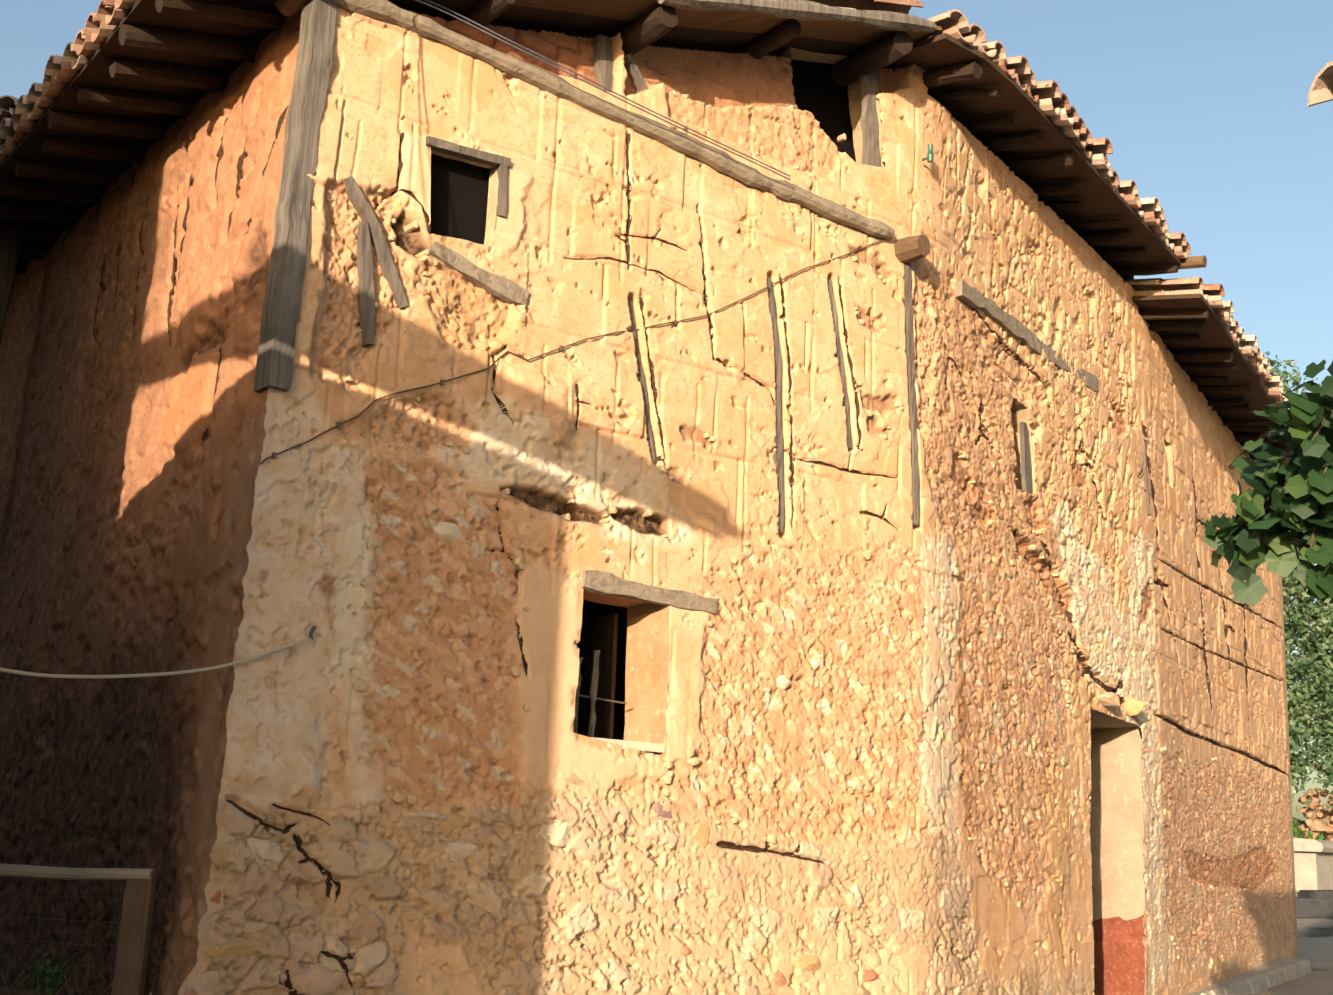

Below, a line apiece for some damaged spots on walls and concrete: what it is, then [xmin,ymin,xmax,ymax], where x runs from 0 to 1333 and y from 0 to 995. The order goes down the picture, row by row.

crack [93,105,289,347]
crack [202,329,227,442]
peeling [306,176,673,821]
spalling [653,462,692,488]
spalling [679,423,718,452]
spalling [1138,576,1156,628]
crack [1012,420,1290,777]
peeling [949,446,1093,914]
crack [226,799,341,899]
crack [716,841,825,864]